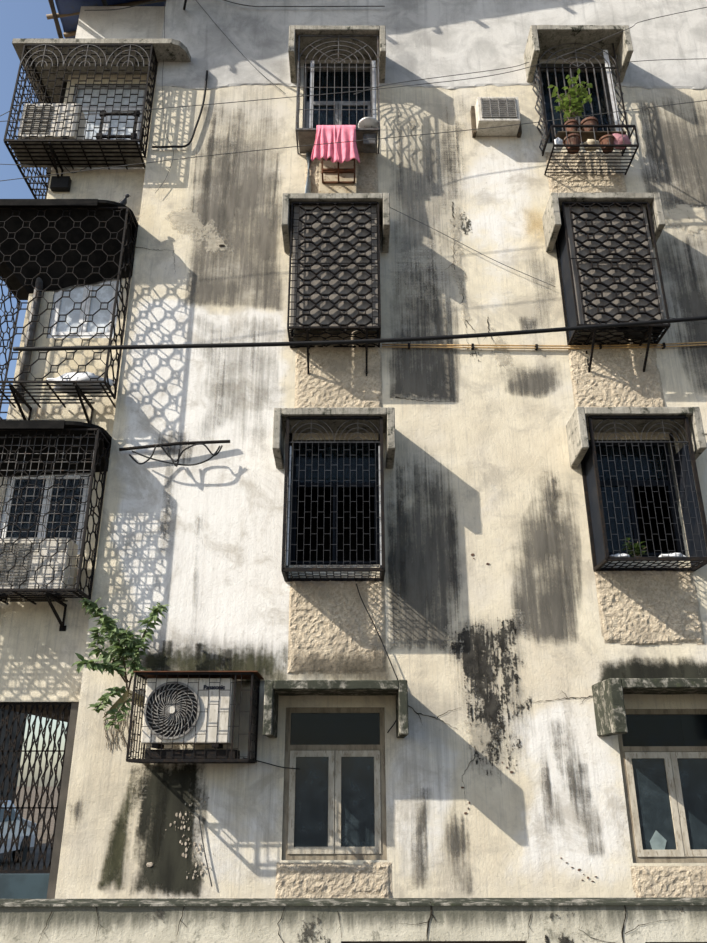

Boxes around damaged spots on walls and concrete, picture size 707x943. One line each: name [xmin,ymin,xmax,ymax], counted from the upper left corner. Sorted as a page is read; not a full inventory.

damp [188,111,282,309]
damp [398,132,459,250]
damp [390,263,482,401]
crack [448,202,499,350]
damp [642,103,707,210]
damp [661,240,707,392]
damp [388,466,581,776]
crack [408,705,481,803]
crack [524,691,593,704]
damp [136,763,214,897]
crack [400,902,436,940]
crack [579,905,667,943]